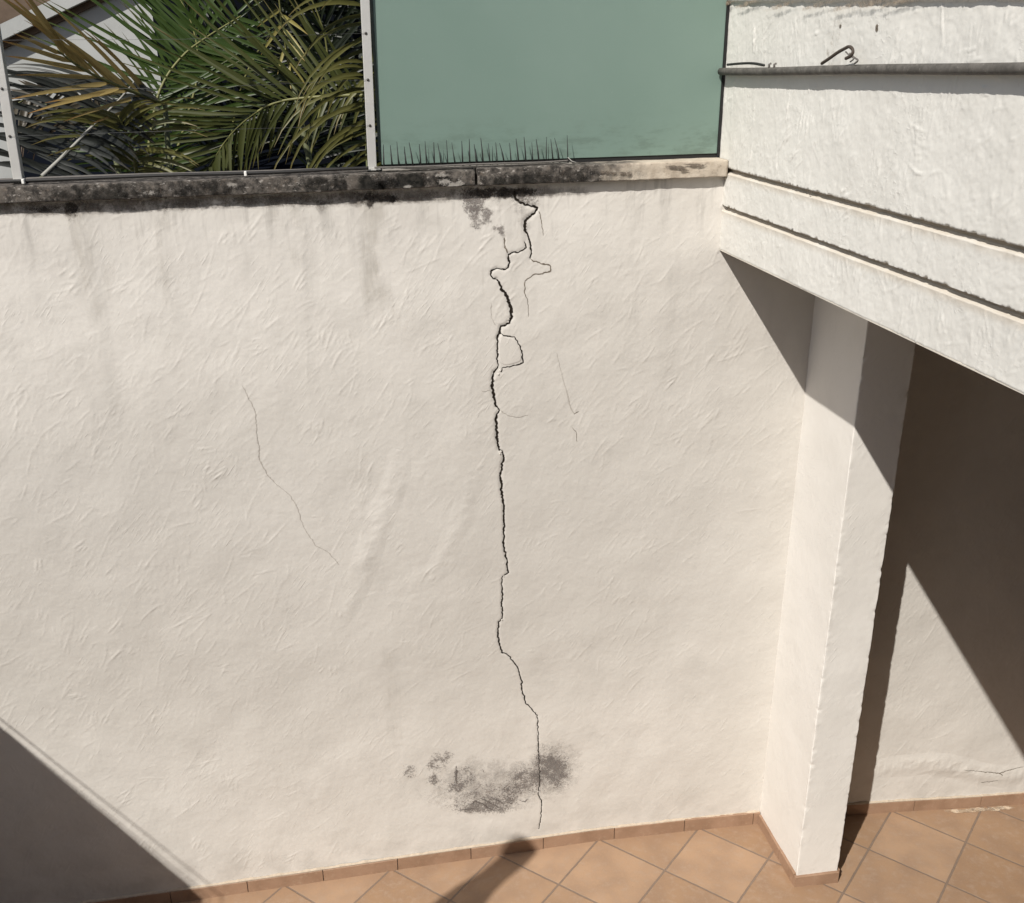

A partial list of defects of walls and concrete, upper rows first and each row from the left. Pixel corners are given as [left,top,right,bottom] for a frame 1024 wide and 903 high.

crack [242,386,339,565]
crack [483,191,551,829]
water stain [428,753,571,813]